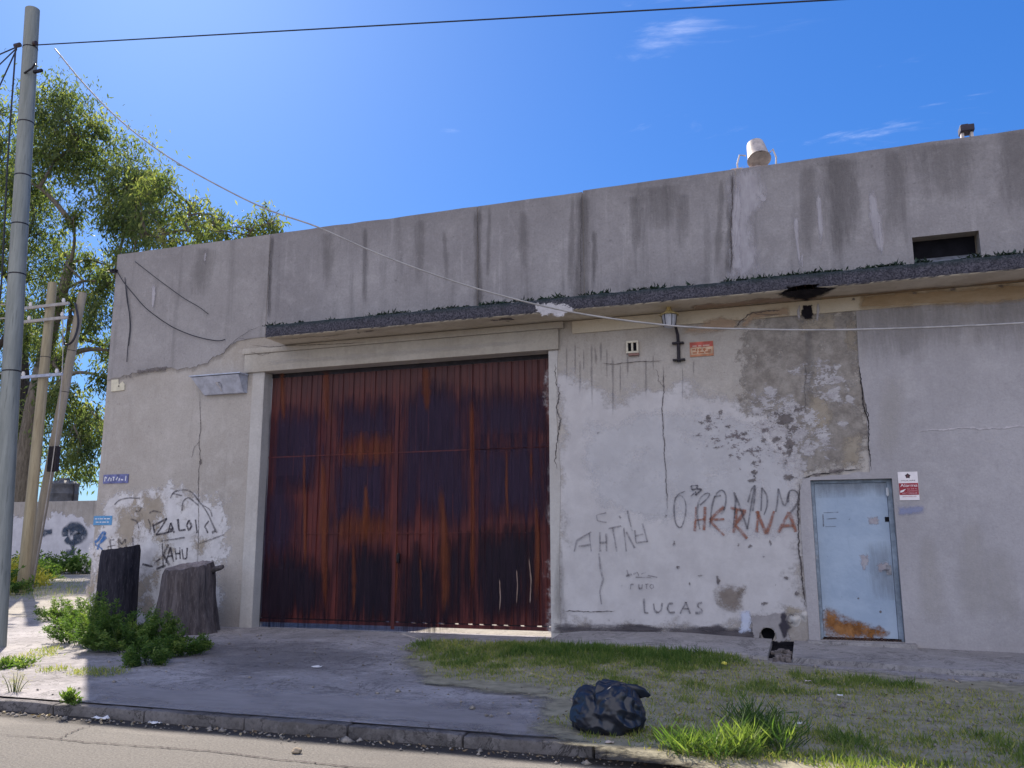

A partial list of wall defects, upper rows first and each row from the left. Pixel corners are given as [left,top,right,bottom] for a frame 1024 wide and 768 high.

leakage [728,170,766,278]
leakage [694,280,1024,310]
peeling [11,515,24,558]
peeling [40,479,232,624]
crack [553,369,561,465]
crack [605,361,668,516]
peeling [469,298,868,632]
crack [797,367,871,605]
rust [823,610,887,640]